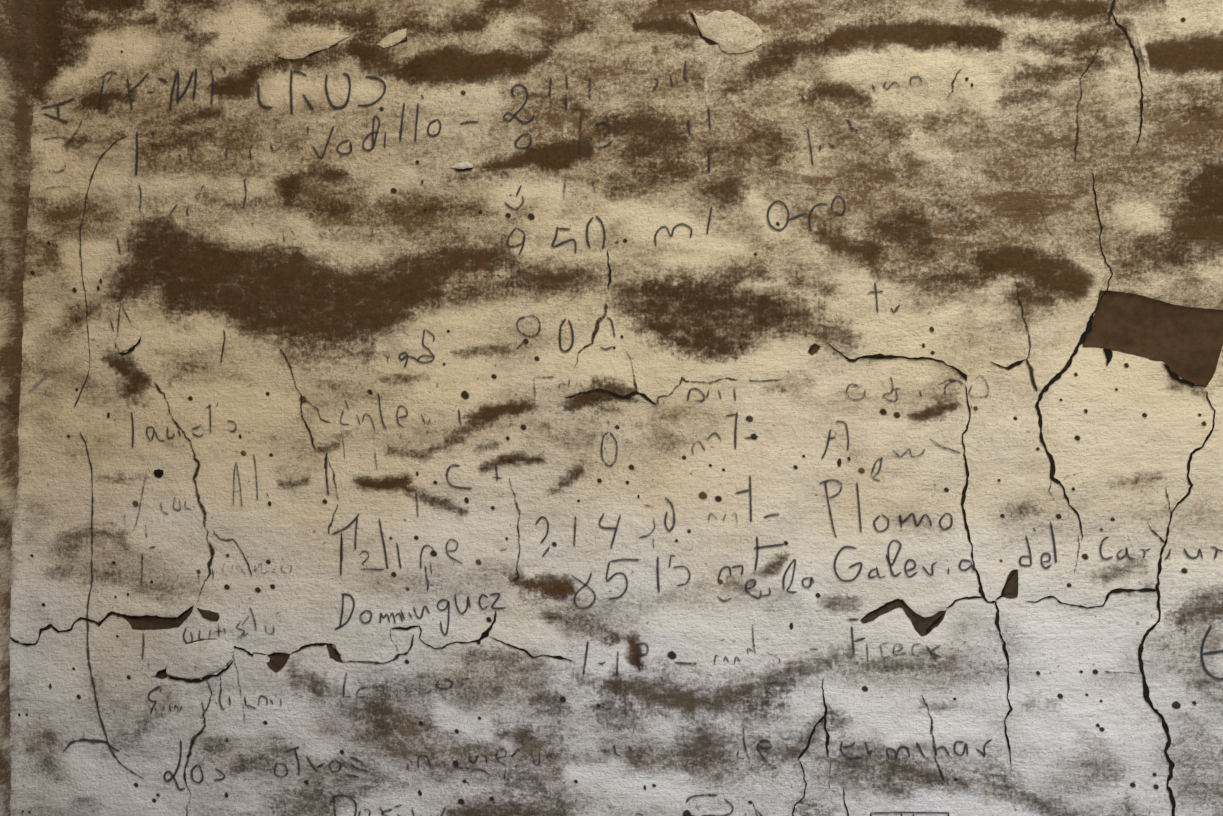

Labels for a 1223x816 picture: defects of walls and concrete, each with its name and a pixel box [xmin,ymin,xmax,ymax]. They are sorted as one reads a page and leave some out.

crack [1108,0,1144,146]
crack [565,251,782,405]
spalling [1078,291,1223,387]
crack [828,50,1216,816]
spalling [121,605,220,630]
spalling [267,652,290,673]
spalling [326,643,343,663]
crack [183,611,573,816]
crack [792,680,849,816]
spalling [860,599,946,636]